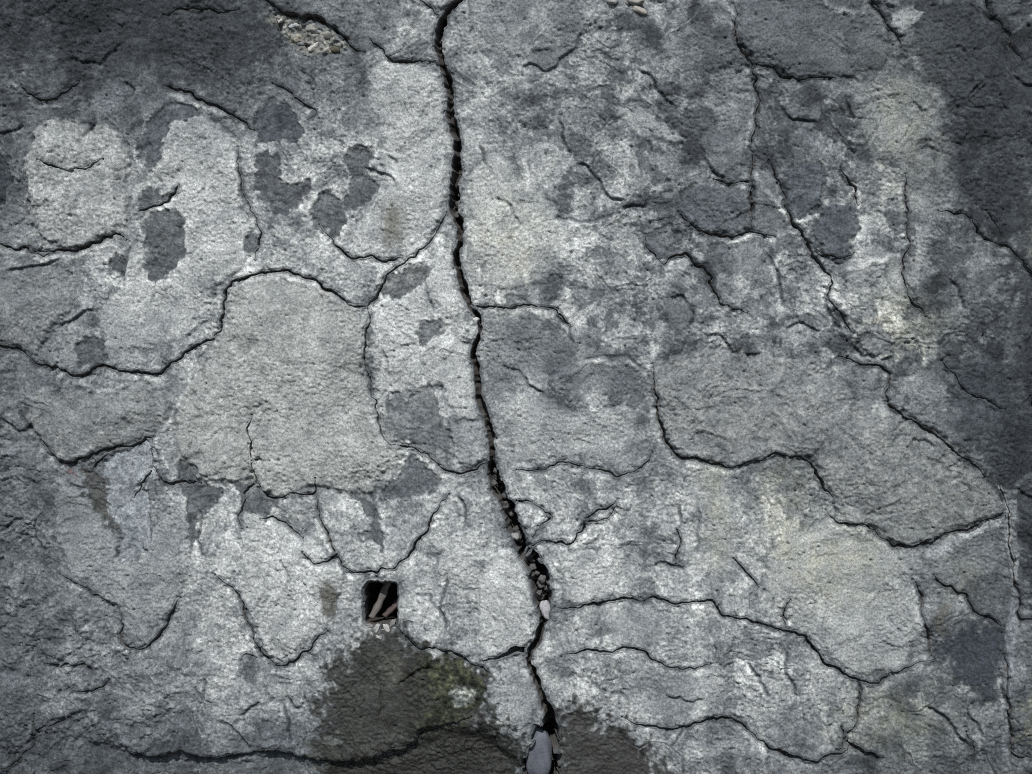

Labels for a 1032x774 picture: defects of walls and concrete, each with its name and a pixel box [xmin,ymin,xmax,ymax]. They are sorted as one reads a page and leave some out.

spalling [606,0,674,15]
crack [869,0,903,47]
crack [981,0,1024,60]
crack [643,3,855,334]
crack [839,167,859,206]
crack [900,174,927,317]
crack [938,209,1032,281]
crack [0,0,618,774]
crack [517,355,1032,627]
crack [554,582,934,764]
crack [965,732,976,760]
crack [1002,654,1032,761]